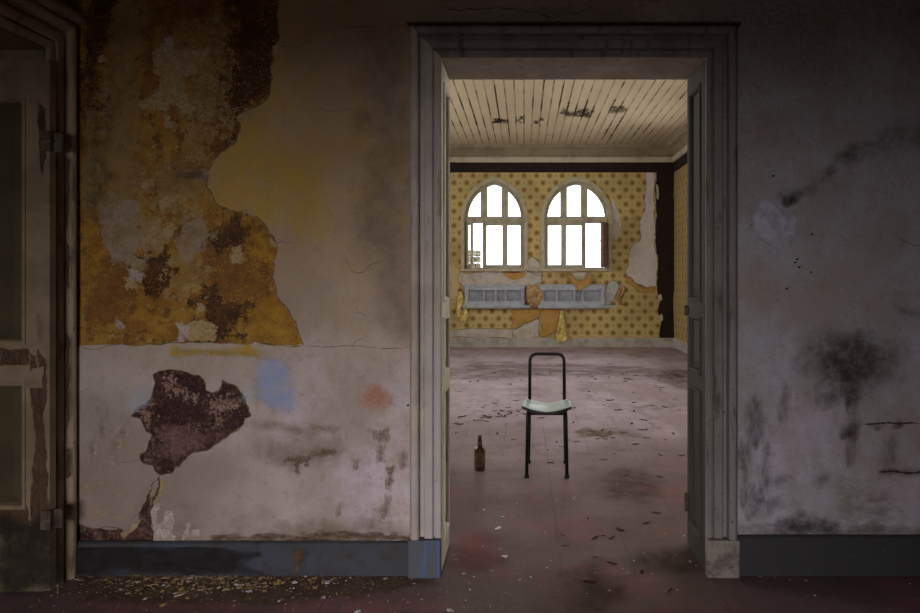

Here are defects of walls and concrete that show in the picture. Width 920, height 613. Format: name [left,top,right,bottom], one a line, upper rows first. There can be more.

flaking render [65,0,304,428]
flaking render [131,369,251,476]
flaking render [77,494,200,541]